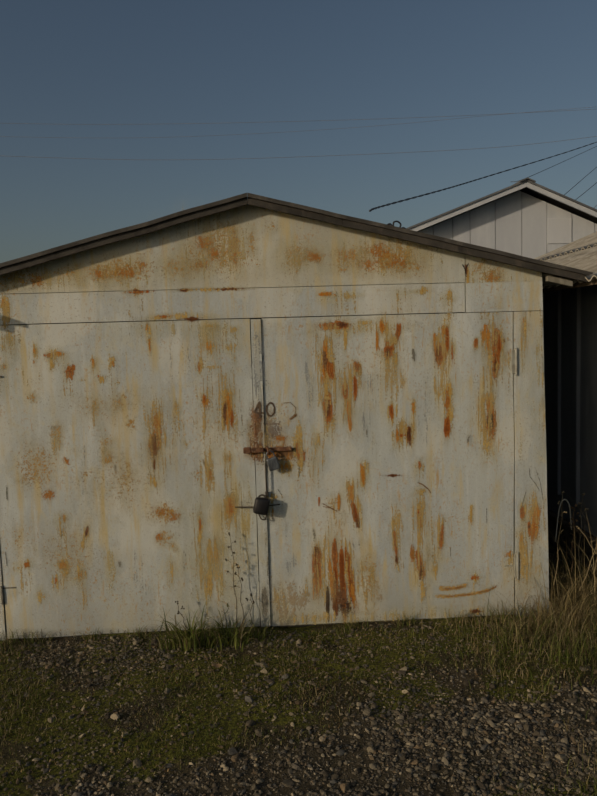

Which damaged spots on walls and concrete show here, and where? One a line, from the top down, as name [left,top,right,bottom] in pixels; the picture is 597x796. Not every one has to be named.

rust [33,342,184,507]
rust [433,290,455,437]
rust [473,312,510,461]
rust [391,461,496,602]
rust [506,492,546,583]